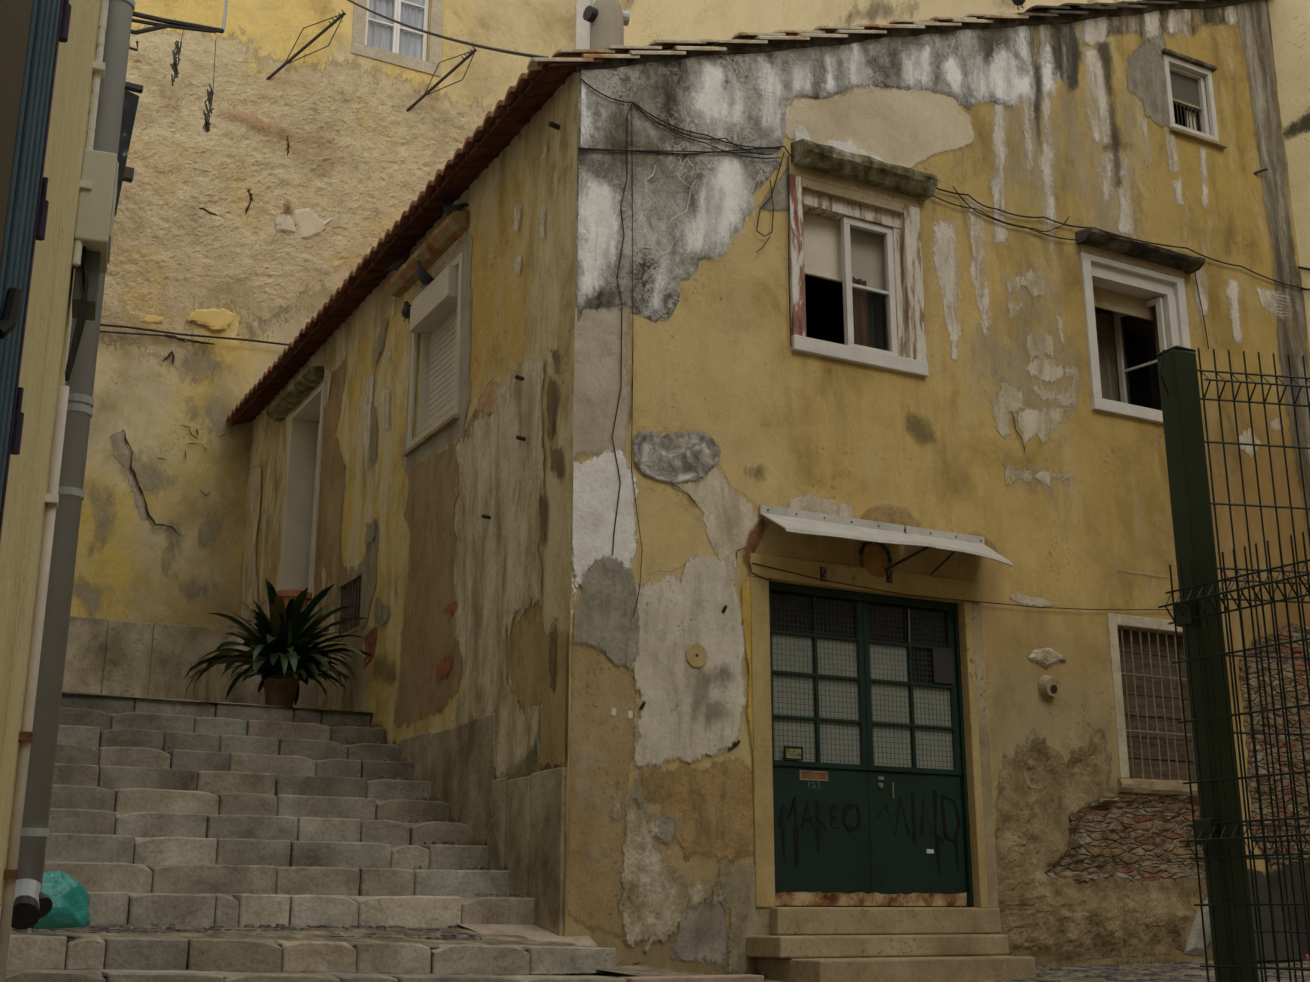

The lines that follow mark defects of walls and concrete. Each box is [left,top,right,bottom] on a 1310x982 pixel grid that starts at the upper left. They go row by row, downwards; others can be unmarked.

water stain [1283,114,1310,138]
spalling [98,21,492,384]
flaking render [546,1,1310,545]
water stain [1195,271,1208,315]
water stain [1226,278,1242,342]
water stain [1256,288,1290,318]
crack [123,425,226,536]
flaking render [393,409,479,729]
peeling [539,495,547,547]
flaking render [1011,591,1056,607]
flaking render [549,465,759,952]
spalling [994,730,1207,904]